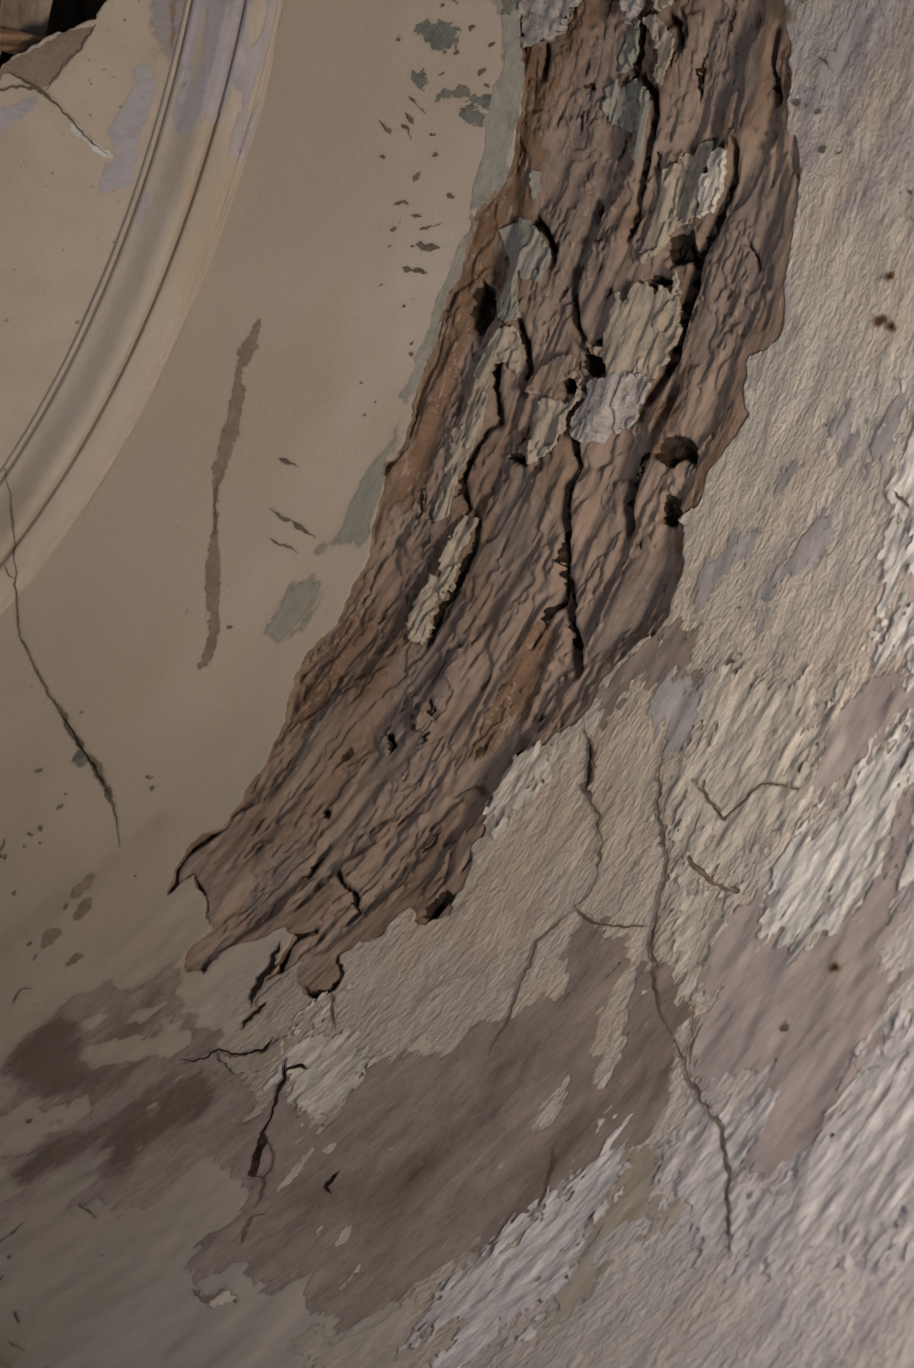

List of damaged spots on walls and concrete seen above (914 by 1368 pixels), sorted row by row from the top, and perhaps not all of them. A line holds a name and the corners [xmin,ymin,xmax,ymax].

peeling [0,24,96,137]
peeling [99,64,157,224]
crack [4,468,120,847]
flaking render [169,0,801,999]
crack [242,1059,308,1243]
peeling [0,789,914,1348]
crack [488,721,799,1257]